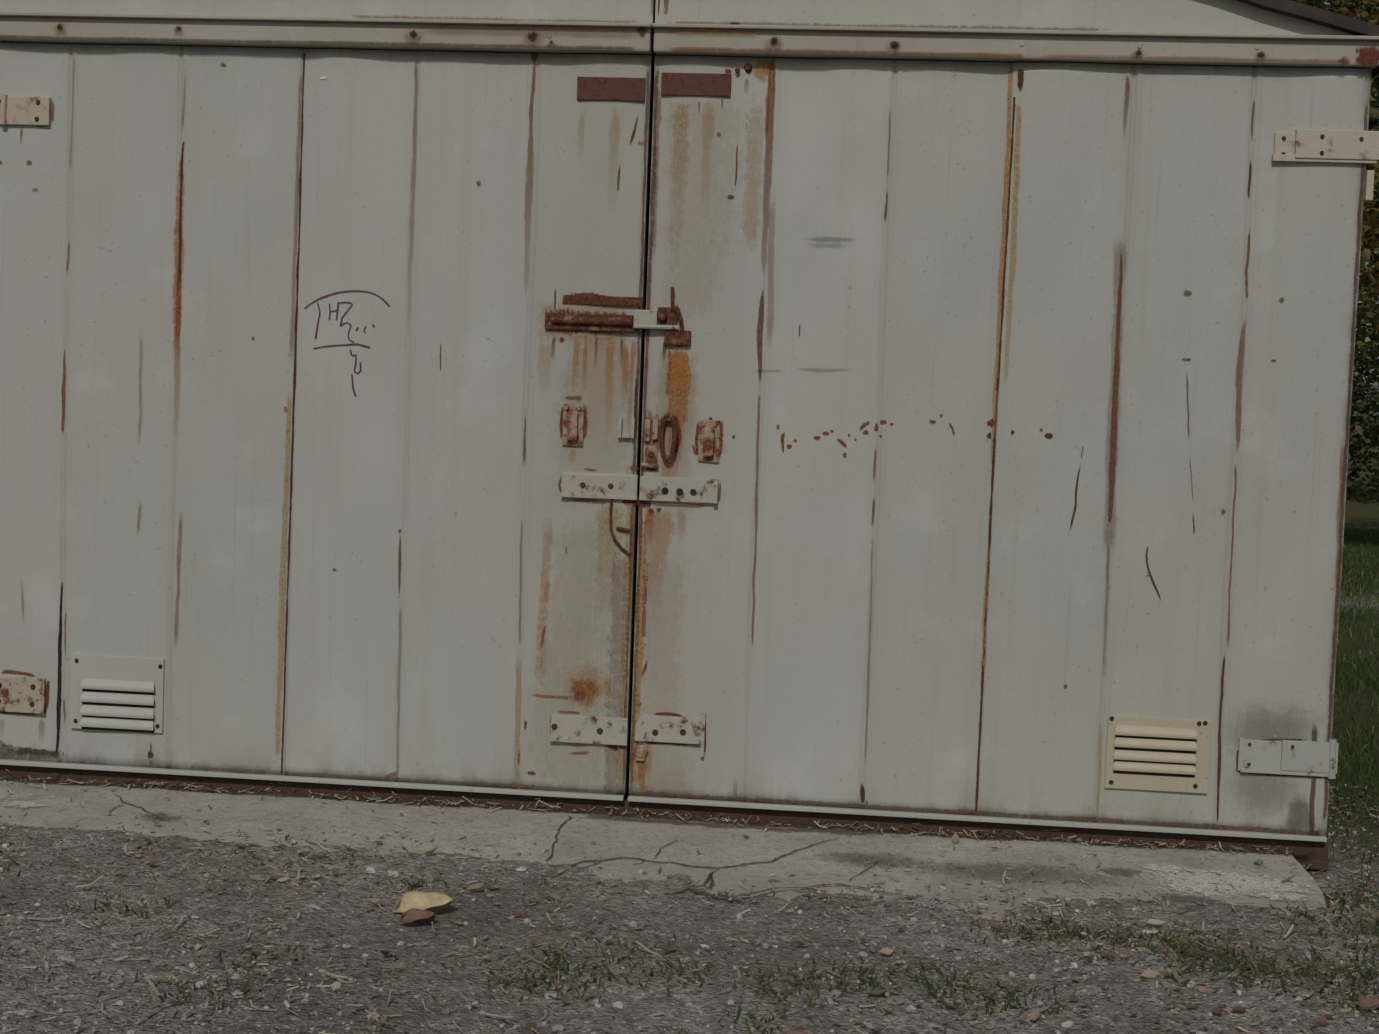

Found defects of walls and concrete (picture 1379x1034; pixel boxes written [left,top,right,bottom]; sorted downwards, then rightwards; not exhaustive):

rust [0,23,1328,856]
rust [1327,163,1365,742]
crack [544,817,973,900]